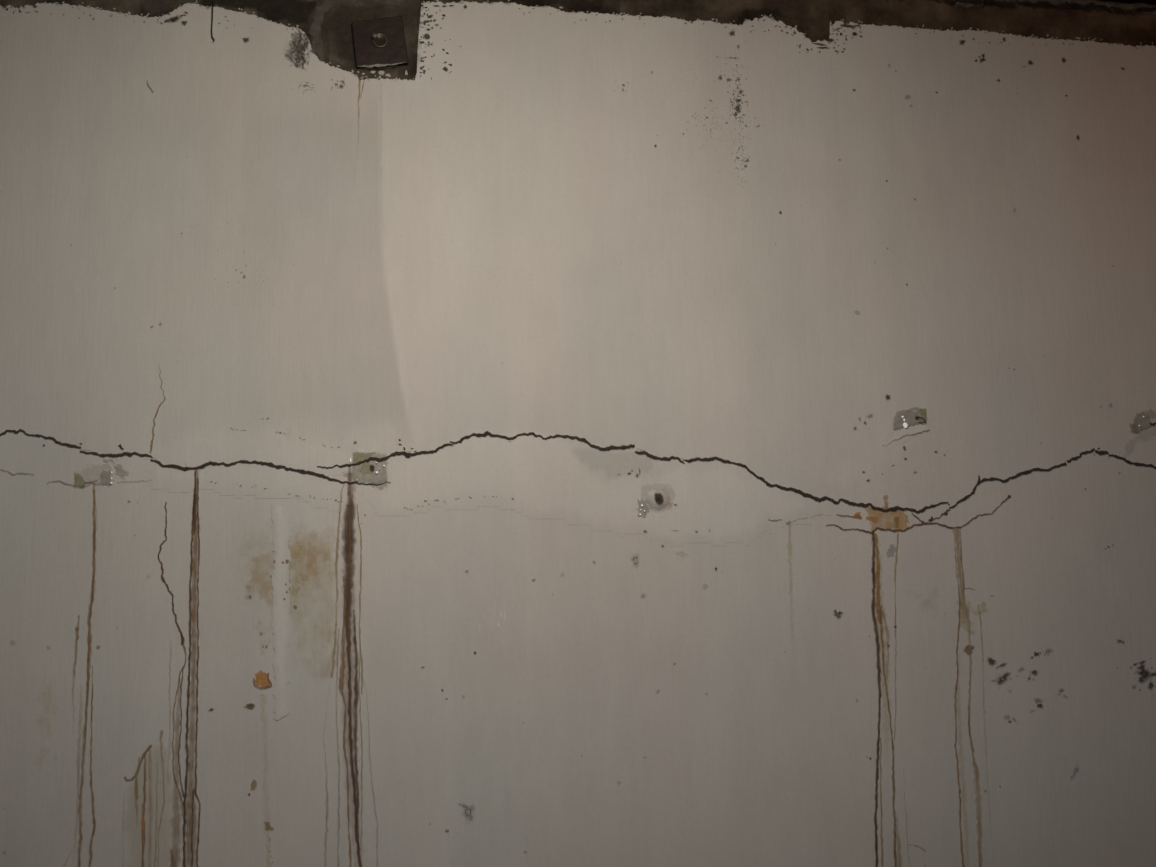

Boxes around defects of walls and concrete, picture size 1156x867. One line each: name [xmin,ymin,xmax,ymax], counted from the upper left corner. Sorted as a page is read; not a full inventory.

peeling [0,0,1156,80]
rust [74,489,98,867]
rust [124,471,200,867]
crack [158,502,185,644]
rust [253,670,272,689]
rust [331,473,363,867]
crack [0,386,1156,533]
rust [836,503,908,867]
rust [955,528,978,867]